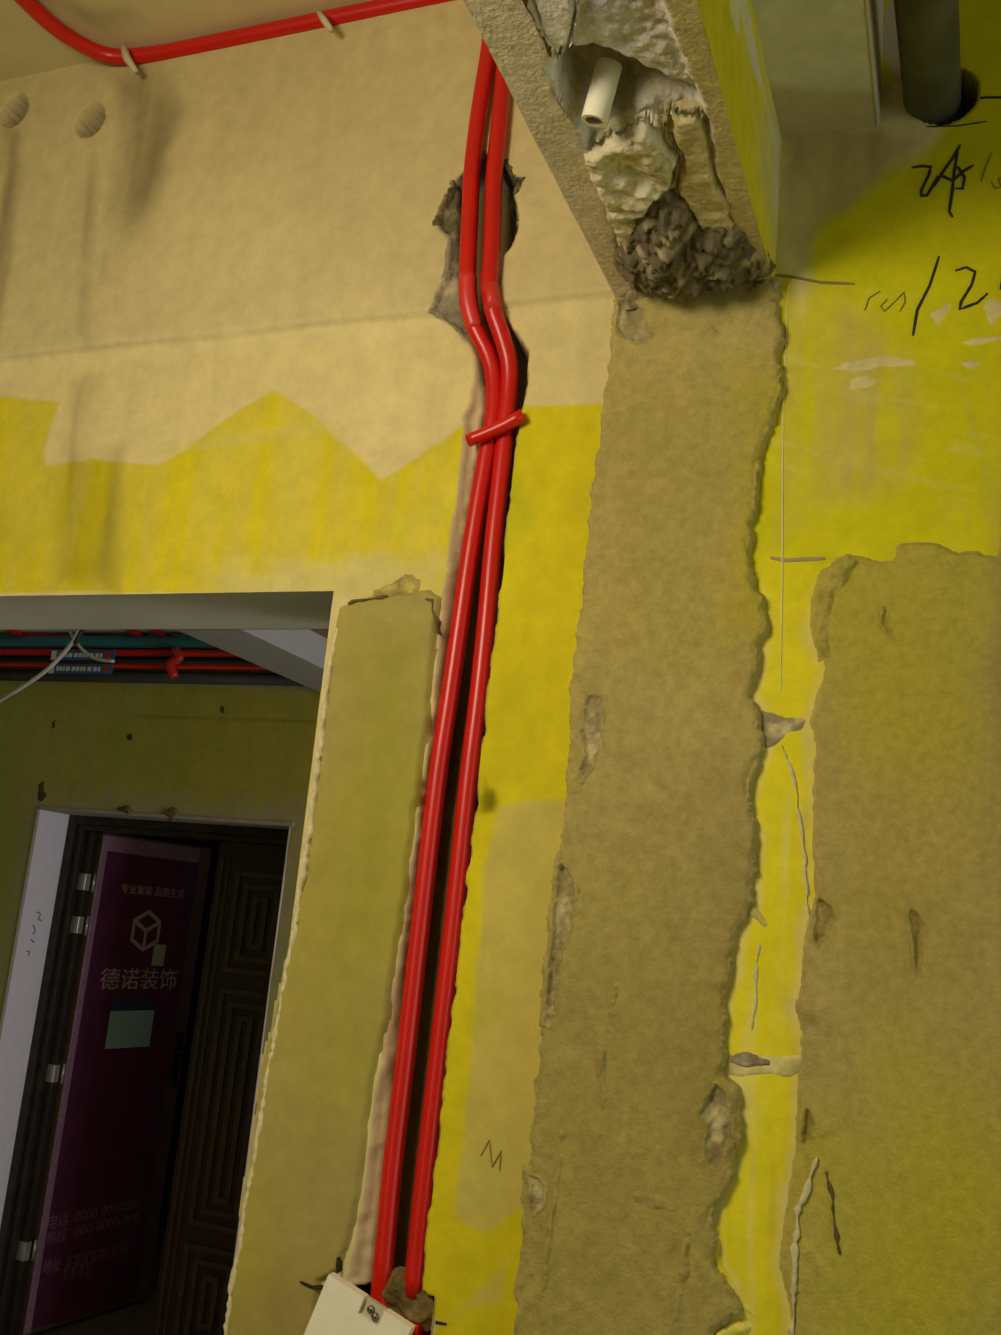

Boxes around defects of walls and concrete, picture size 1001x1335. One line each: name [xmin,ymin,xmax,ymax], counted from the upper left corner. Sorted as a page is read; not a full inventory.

flaking render [432,180,462,242]
flaking render [503,159,526,243]
spalling [528,0,781,345]
flaking render [576,691,608,785]
peeling [761,711,806,748]
flaking render [539,851,581,1030]
flaking render [809,896,839,948]
spalling [906,904,928,979]